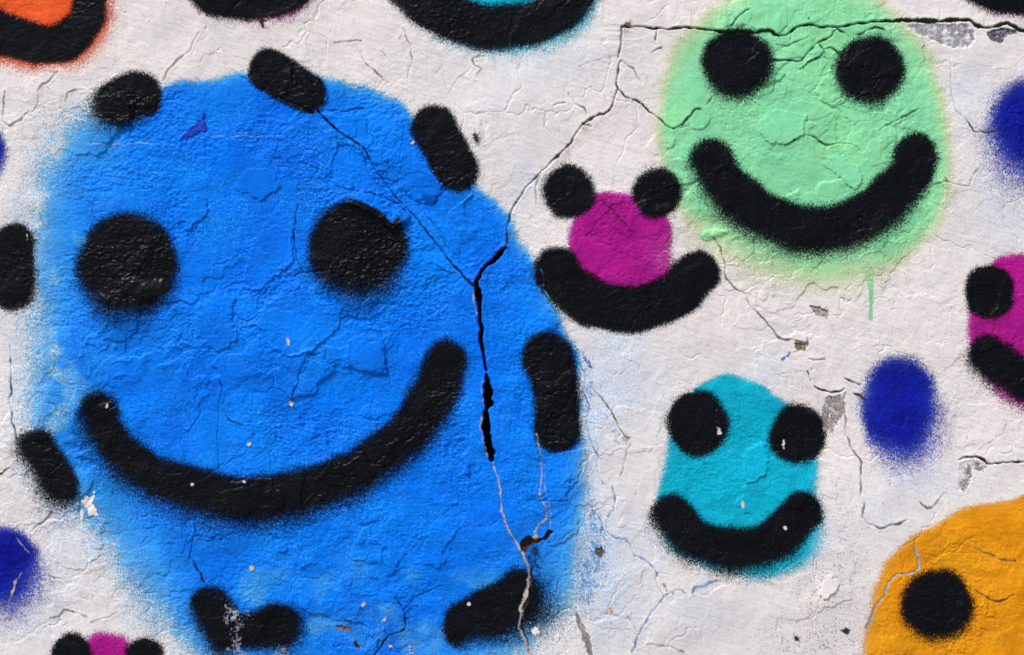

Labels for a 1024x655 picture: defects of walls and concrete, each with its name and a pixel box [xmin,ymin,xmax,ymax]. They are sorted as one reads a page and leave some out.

flaking render [911,24,974,48]
crack [255,18,1024,655]
flaking render [822,395,845,432]